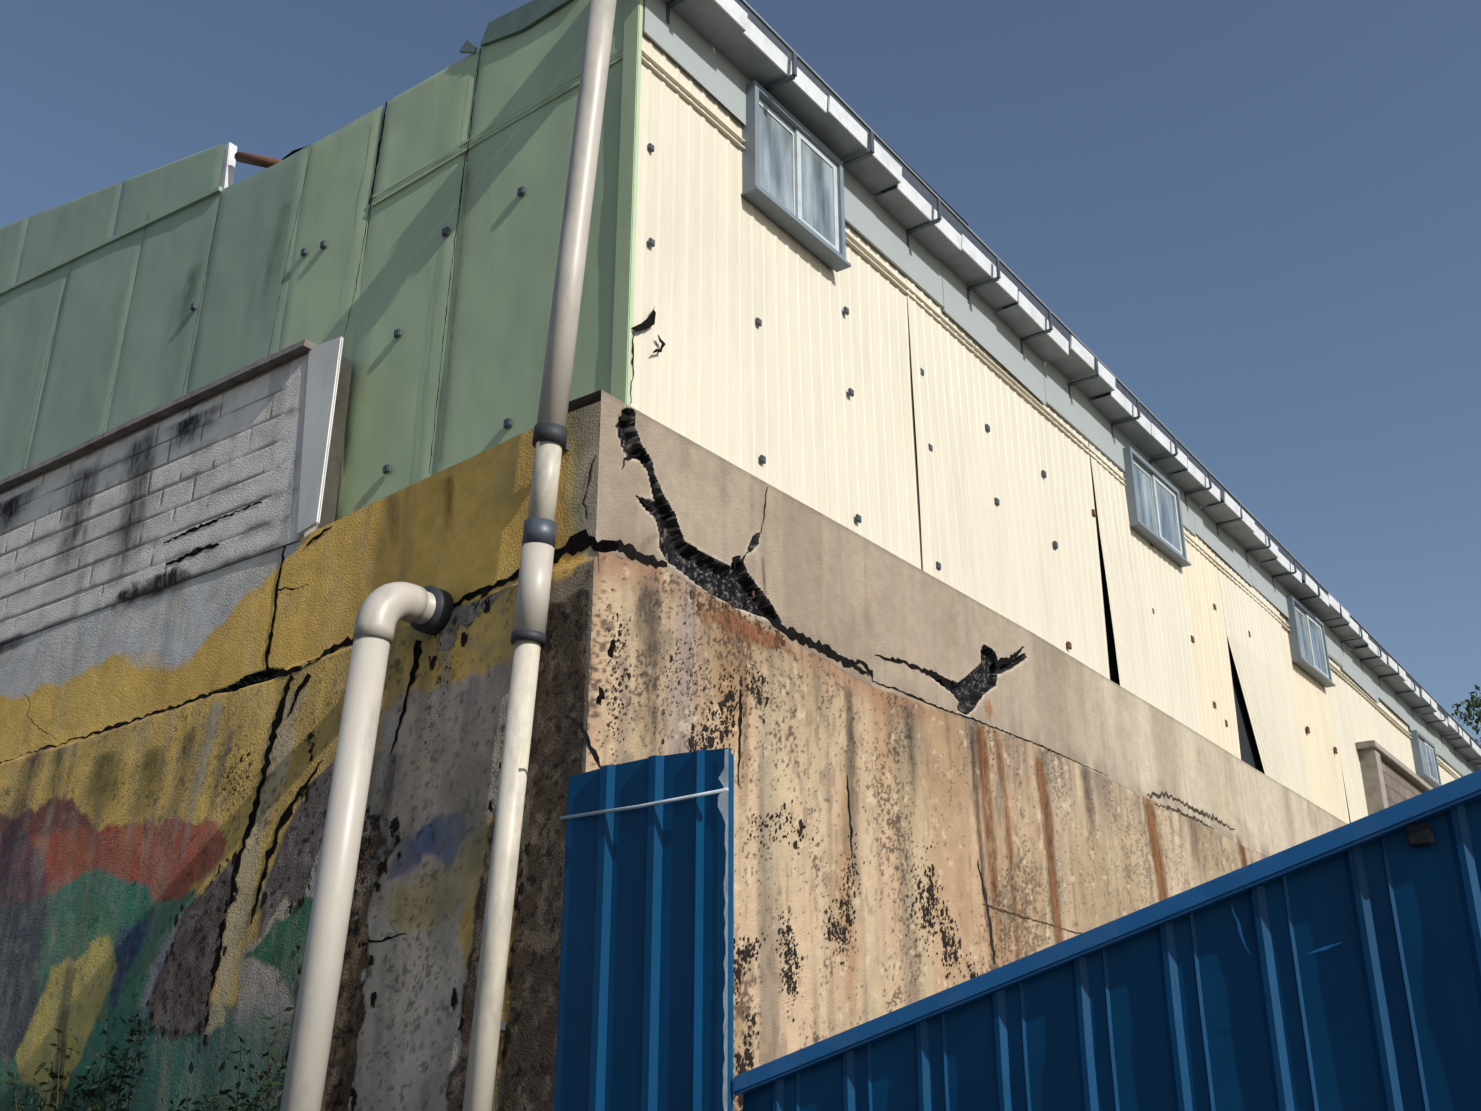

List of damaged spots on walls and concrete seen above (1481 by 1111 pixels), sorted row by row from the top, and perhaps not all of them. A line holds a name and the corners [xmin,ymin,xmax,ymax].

water stain [0,494,22,524]
water stain [118,567,189,603]
water stain [177,407,212,441]
peeling [414,589,503,771]
crack [454,569,519,608]
crack [553,407,1108,785]
crack [0,526,353,1024]
rust [976,703,1017,933]
rust [1036,757,1062,943]
rust [1145,799,1167,901]
peeling [321,805,401,1111]
peeling [446,800,495,1111]